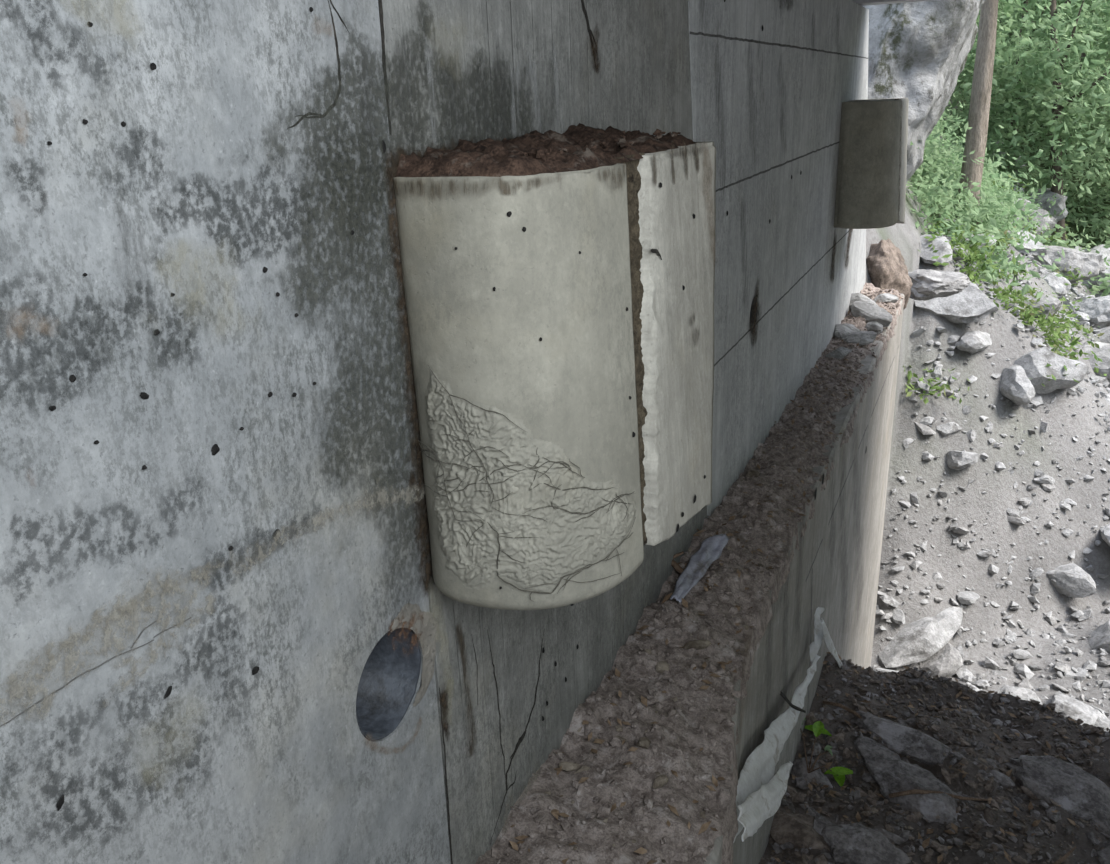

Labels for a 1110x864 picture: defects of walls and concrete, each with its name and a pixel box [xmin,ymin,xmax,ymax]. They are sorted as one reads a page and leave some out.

crack [286,0,350,130]
crack [581,0,596,67]
damp [0,0,534,723]
crack [418,365,636,602]
damp [40,724,126,838]
crack [0,617,192,727]
damp [157,704,206,776]
damp [457,625,474,754]
crack [472,629,545,844]